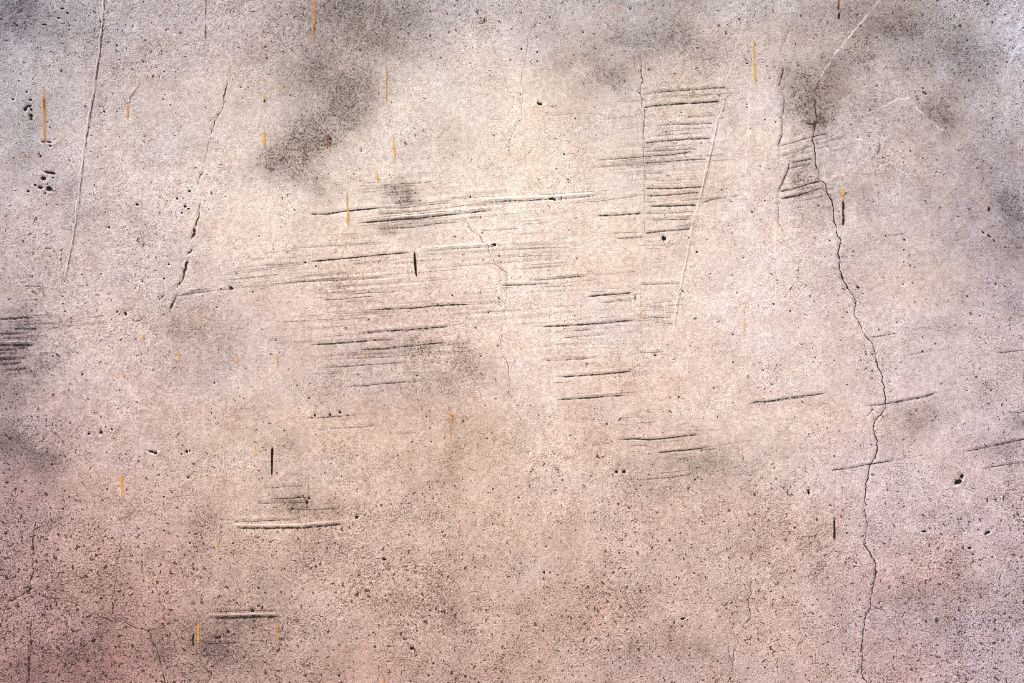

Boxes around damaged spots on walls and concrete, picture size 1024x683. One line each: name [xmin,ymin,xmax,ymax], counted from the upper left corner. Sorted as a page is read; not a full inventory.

crack [162,205,200,308]
crack [778,69,886,682]